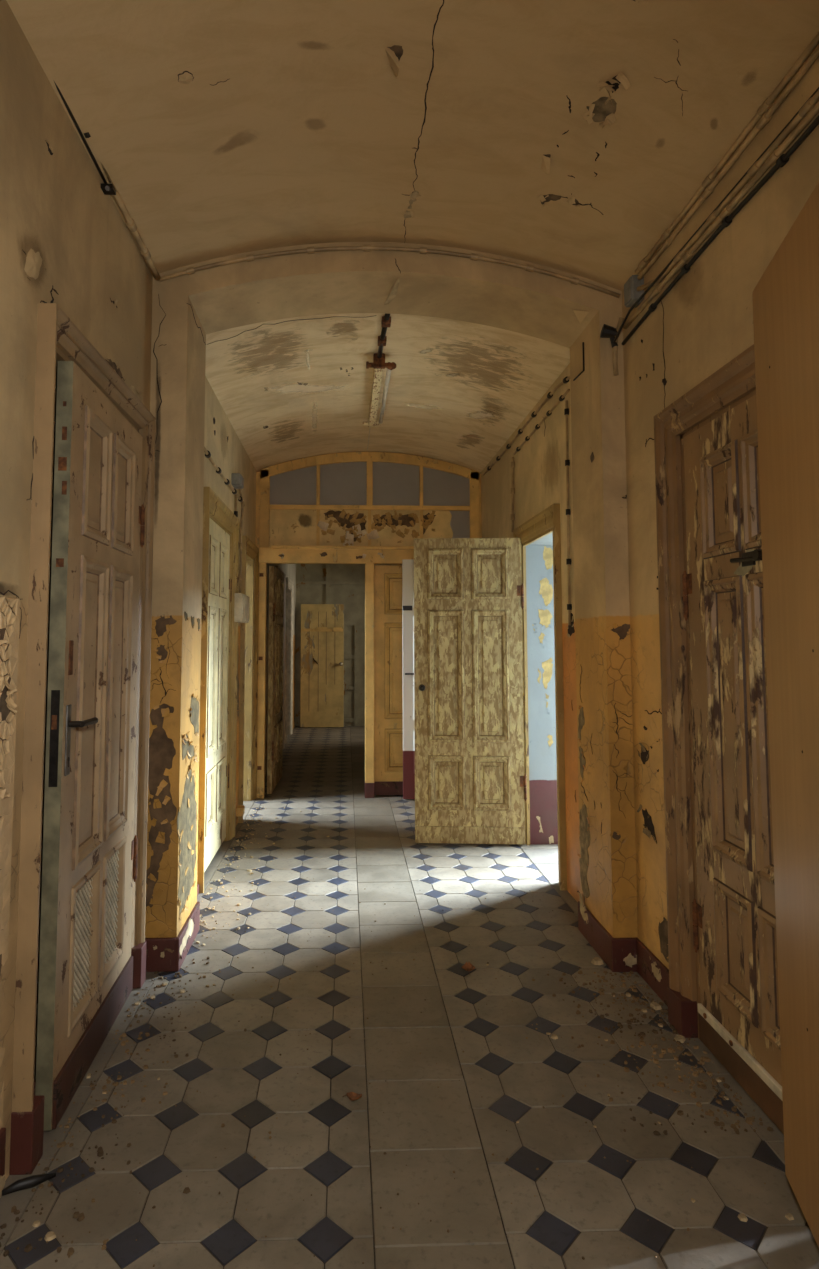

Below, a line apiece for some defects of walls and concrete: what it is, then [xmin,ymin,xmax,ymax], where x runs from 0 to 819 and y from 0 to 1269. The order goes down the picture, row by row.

spalling [582,73,631,129]
crack [395,0,444,273]
crack [561,142,607,215]
peeling [321,509,436,559]
peeling [152,612,202,663]
peeling [611,623,631,643]
spalling [637,724,660,772]
peeling [0,596,20,973]
peeling [146,693,200,959]
spalling [637,804,657,844]